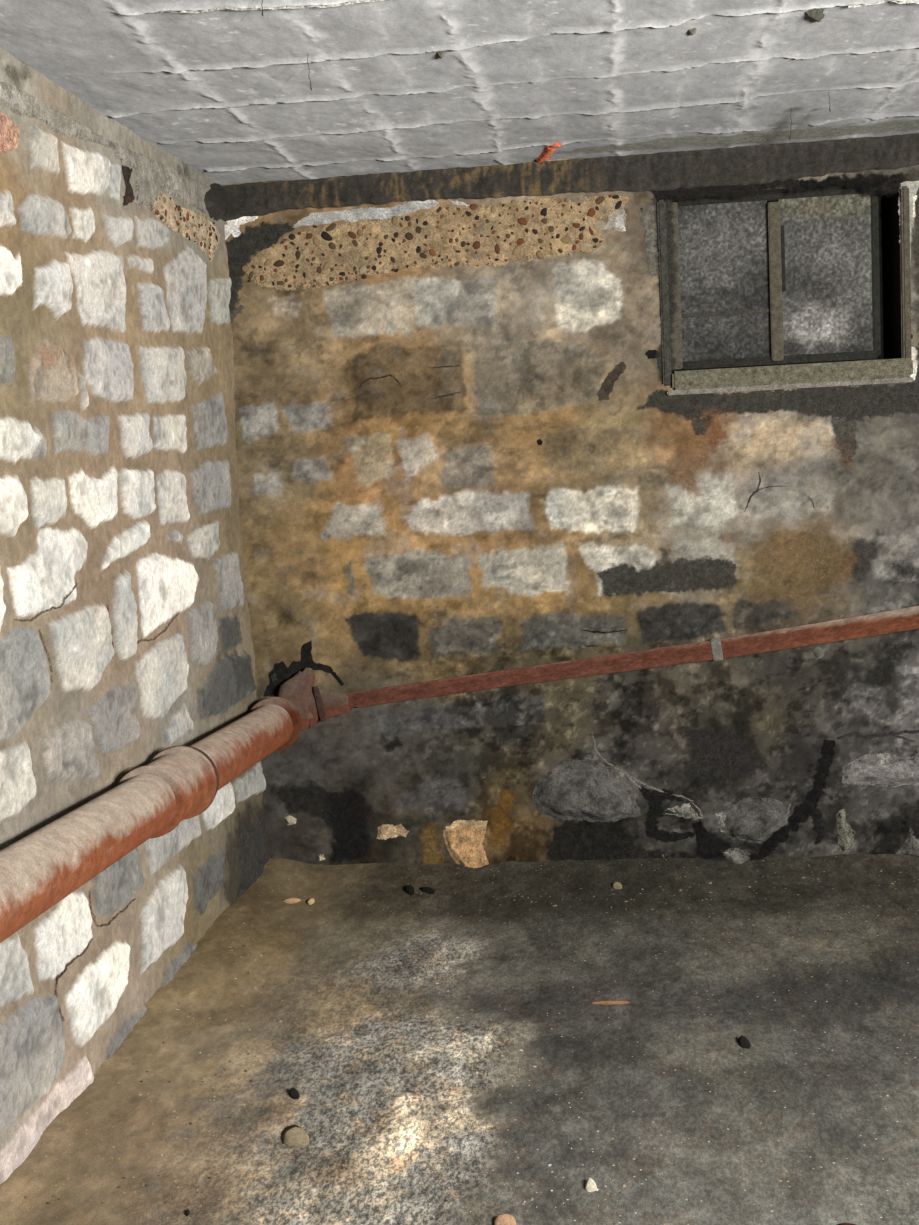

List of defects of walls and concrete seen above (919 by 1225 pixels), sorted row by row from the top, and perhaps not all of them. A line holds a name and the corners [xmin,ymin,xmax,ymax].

crack [161,0,383,13]
crack [848,0,919,8]
damp [597,548,737,596]
damp [853,540,878,581]
damp [892,563,919,578]
damp [866,661,895,686]
damp [386,739,402,751]
crack [591,730,919,861]
damp [224,803,269,904]
damp [270,781,373,863]
rust [421,828,444,865]
damp [546,820,661,861]